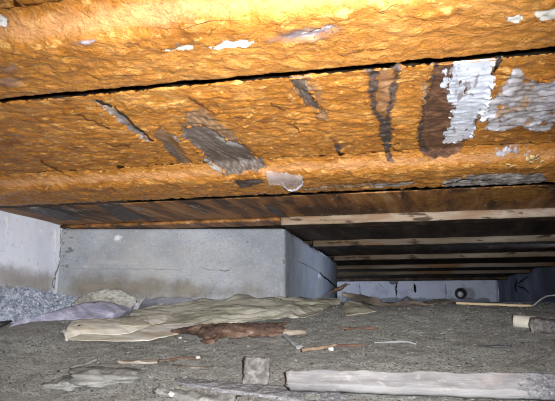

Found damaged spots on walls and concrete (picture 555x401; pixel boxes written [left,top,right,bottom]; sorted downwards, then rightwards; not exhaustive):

peeling [208,38,254,50]
peeling [534,8,555,23]
peeling [289,74,328,120]
water stain [365,63,402,161]
peeling [440,56,555,144]
peeling [93,99,430,192]
peeling [442,144,547,187]
crack [52,230,83,290]